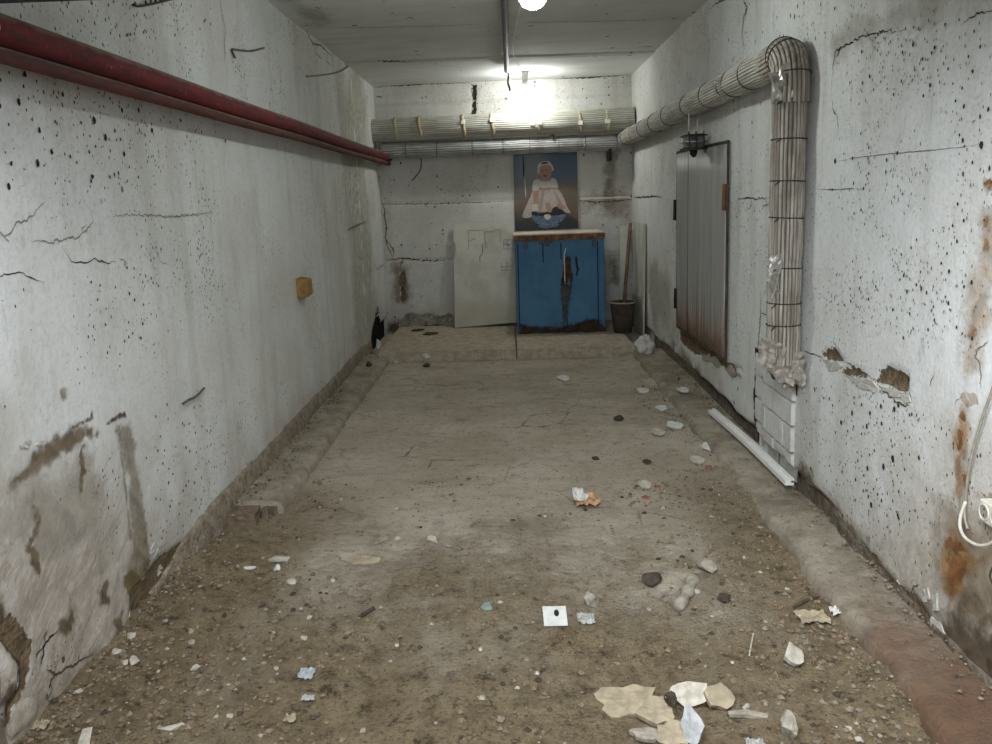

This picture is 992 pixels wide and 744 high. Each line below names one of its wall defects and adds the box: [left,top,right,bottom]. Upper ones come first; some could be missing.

crack [0,202,214,265]
spalling [806,347,919,439]
water stain [12,412,99,492]
water stain [107,411,149,594]
spalling [851,445,925,512]
rust [954,411,969,494]
water stain [27,505,41,574]
water stain [59,610,74,635]
water stain [102,580,110,604]
rust [942,532,975,594]
spalling [0,612,32,723]